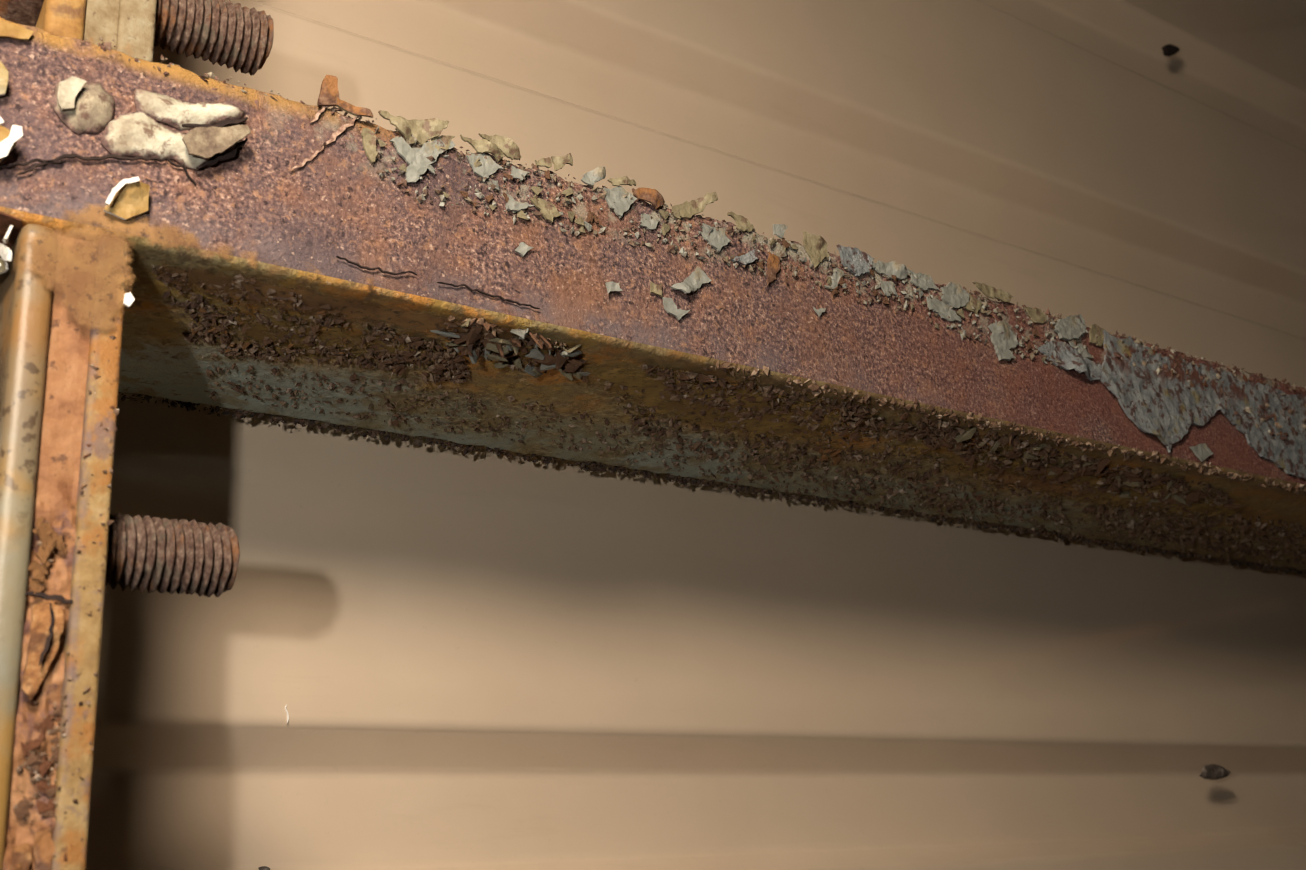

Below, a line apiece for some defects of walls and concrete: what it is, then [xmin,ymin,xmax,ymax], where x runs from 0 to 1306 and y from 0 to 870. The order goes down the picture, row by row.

peeling [0,20,34,40]
peeling [0,61,8,96]
peeling [103,177,150,220]
peeling [317,75,1306,479]